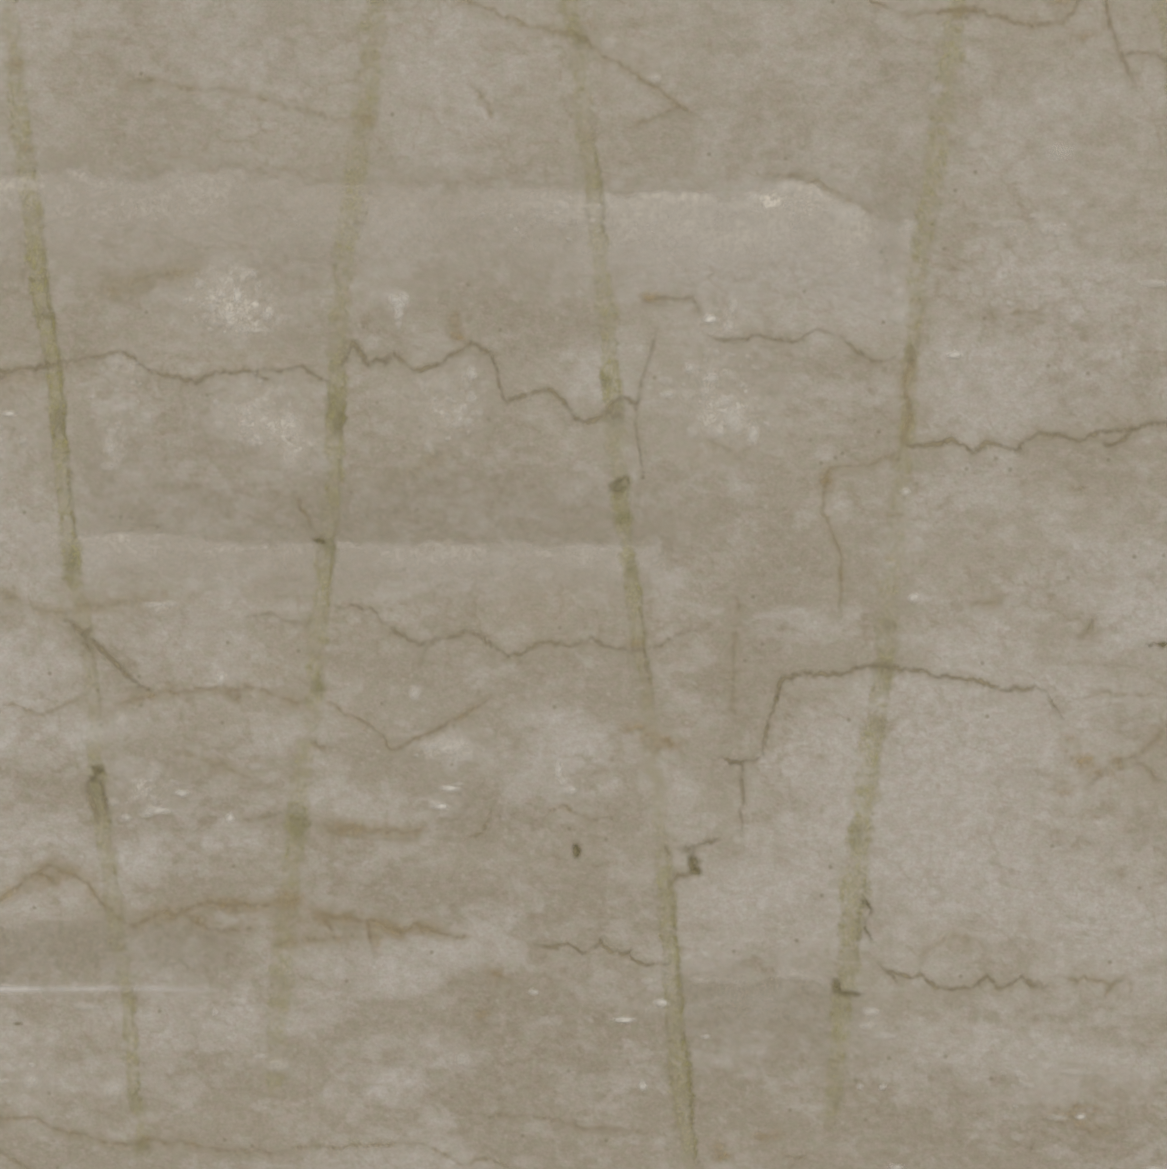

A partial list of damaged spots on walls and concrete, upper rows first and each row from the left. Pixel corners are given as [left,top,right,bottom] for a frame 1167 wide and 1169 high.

damp [479,181,879,266]
crack [163,369,267,382]
crack [345,341,633,425]
crack [903,362,1159,451]
crack [55,611,175,700]
crack [451,631,569,658]
crack [764,665,1055,739]
crack [724,758,744,799]